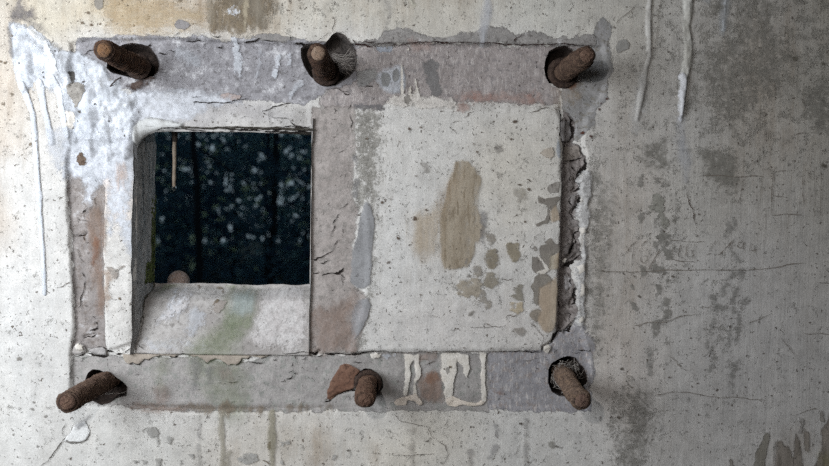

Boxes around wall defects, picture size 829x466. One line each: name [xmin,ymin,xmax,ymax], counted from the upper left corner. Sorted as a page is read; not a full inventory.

crack [147,32,222,79]
crack [245,19,592,48]
leakage [635,0,652,120]
leakage [9,0,238,296]
spalling [65,17,629,429]
rust [327,364,359,399]